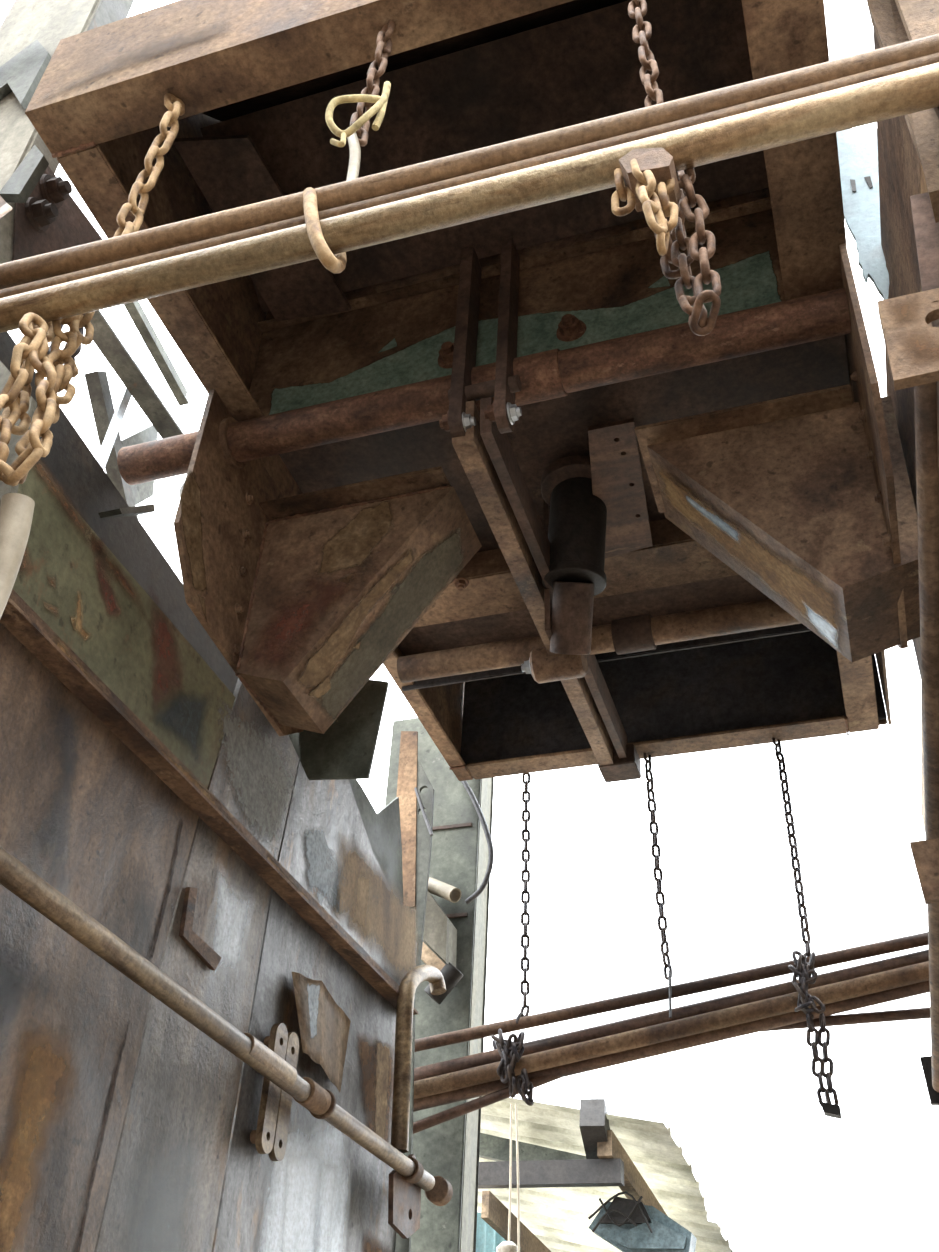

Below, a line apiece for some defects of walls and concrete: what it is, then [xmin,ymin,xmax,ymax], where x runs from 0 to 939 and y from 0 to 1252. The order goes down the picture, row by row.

rust [34,460,137,601]